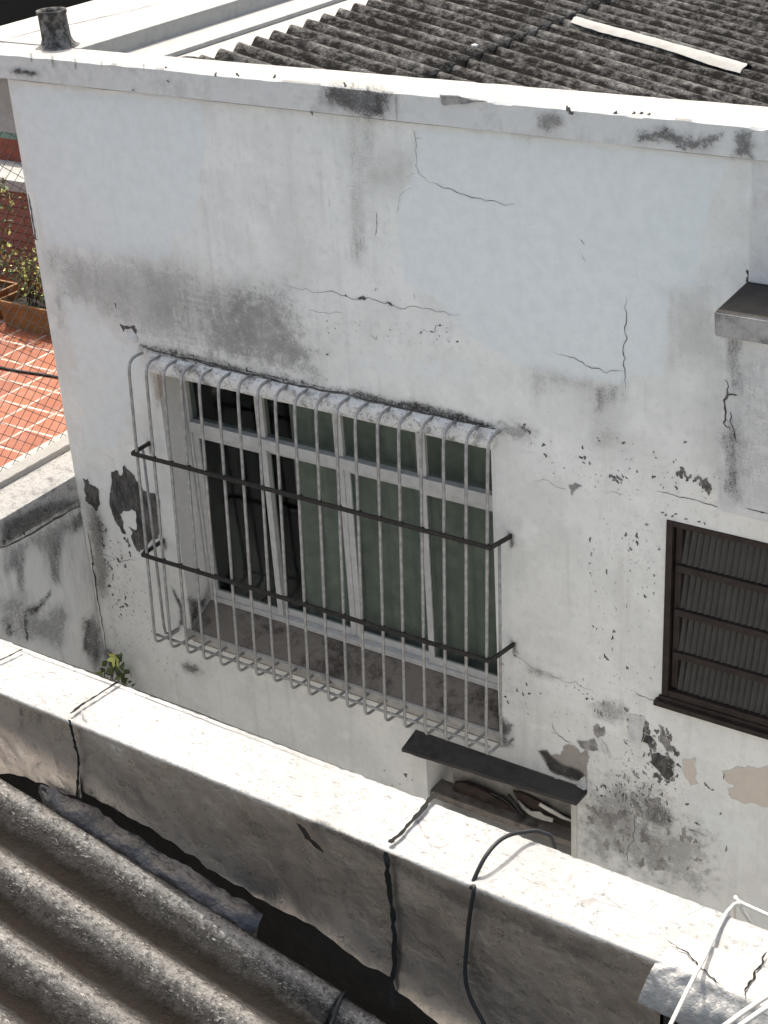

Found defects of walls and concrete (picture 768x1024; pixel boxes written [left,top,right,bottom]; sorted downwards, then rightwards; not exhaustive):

water stain [325,83,392,117]
water stain [637,127,753,158]
crack [723,380,738,440]
spalling [568,437,715,525]
water stain [3,502,106,589]
peeling [83,465,161,627]
water stain [6,592,57,638]
crack [0,616,349,799]
peeling [538,677,714,871]
peeling [722,765,768,808]
crack [383,792,439,1009]
crack [669,941,767,995]